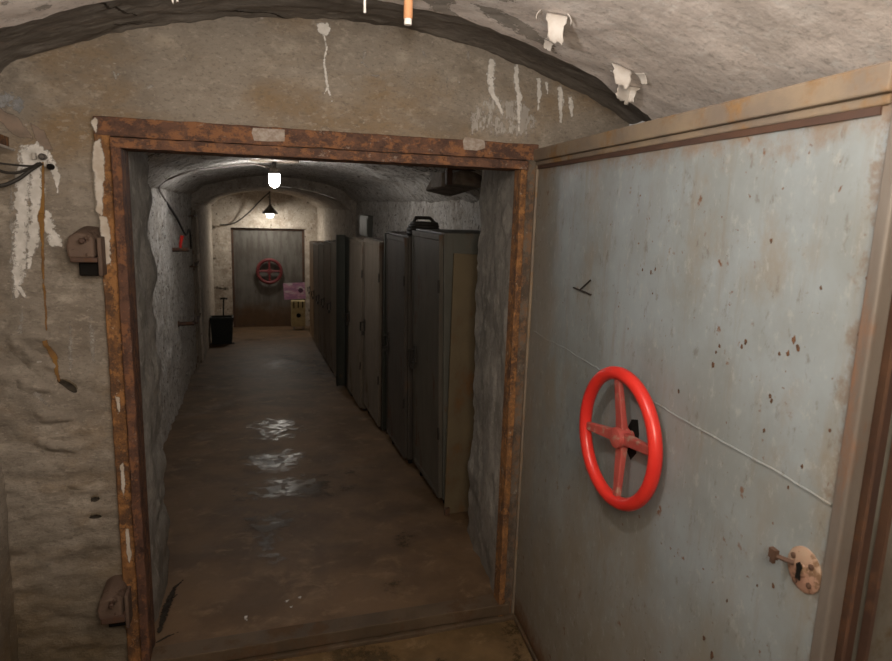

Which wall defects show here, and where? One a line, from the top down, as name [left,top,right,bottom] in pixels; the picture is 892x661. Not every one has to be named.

leakage [317,22,333,102]
leakage [470,59,574,139]
peeling [610,63,648,105]
leakage [9,141,63,300]
corrosion [38,162,61,382]